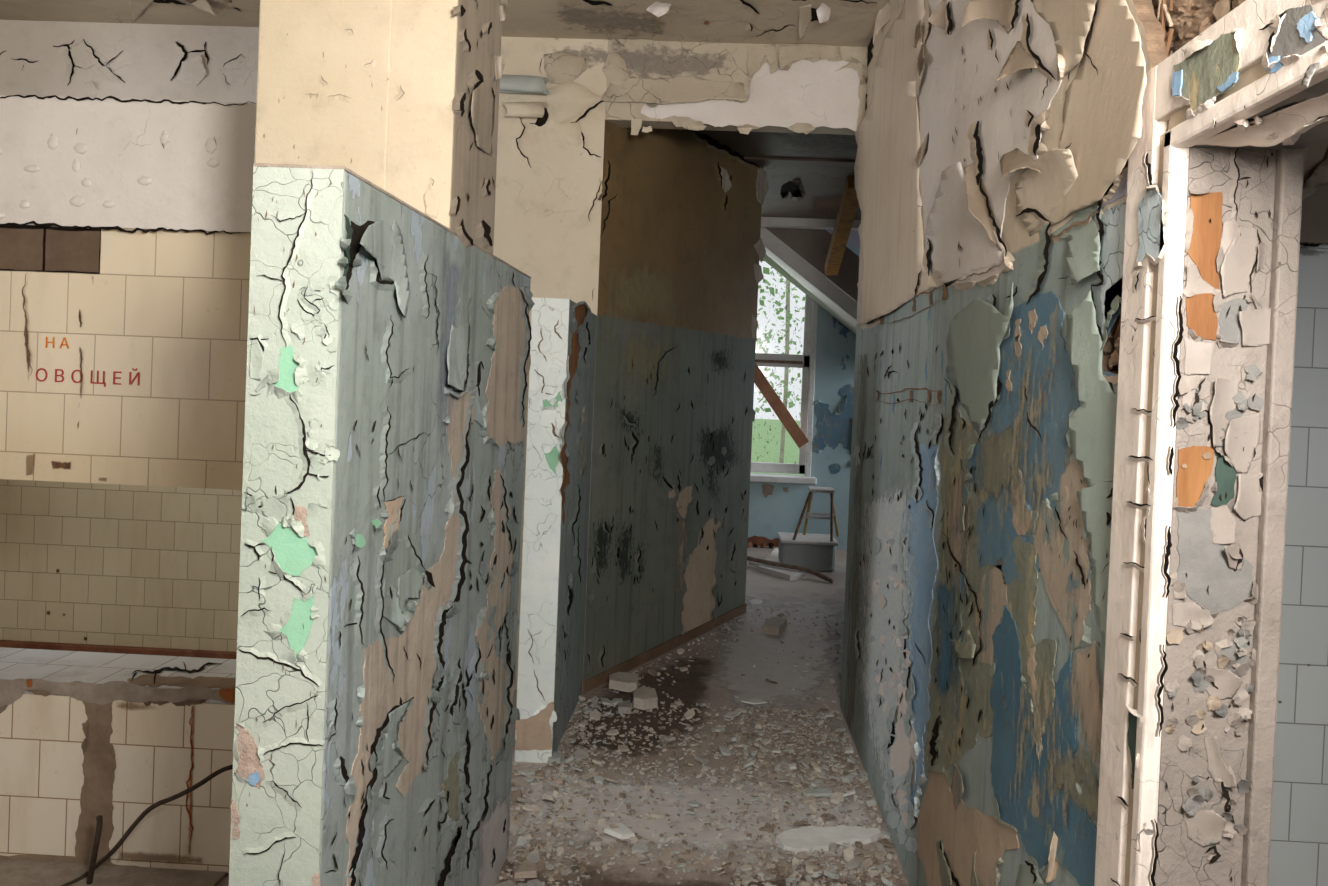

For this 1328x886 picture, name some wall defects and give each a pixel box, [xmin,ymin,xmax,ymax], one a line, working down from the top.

crack [166,33,288,85]
crack [427,3,531,248]
crack [570,95,617,238]
peeling [1196,0,1328,147]
crack [132,133,747,886]
peeling [344,285,593,886]
leakage [590,520,648,584]
leakage [697,425,739,500]
peeling [544,0,1168,886]
peeling [1164,187,1271,849]
spalling [0,674,236,868]
rust [120,706,200,862]